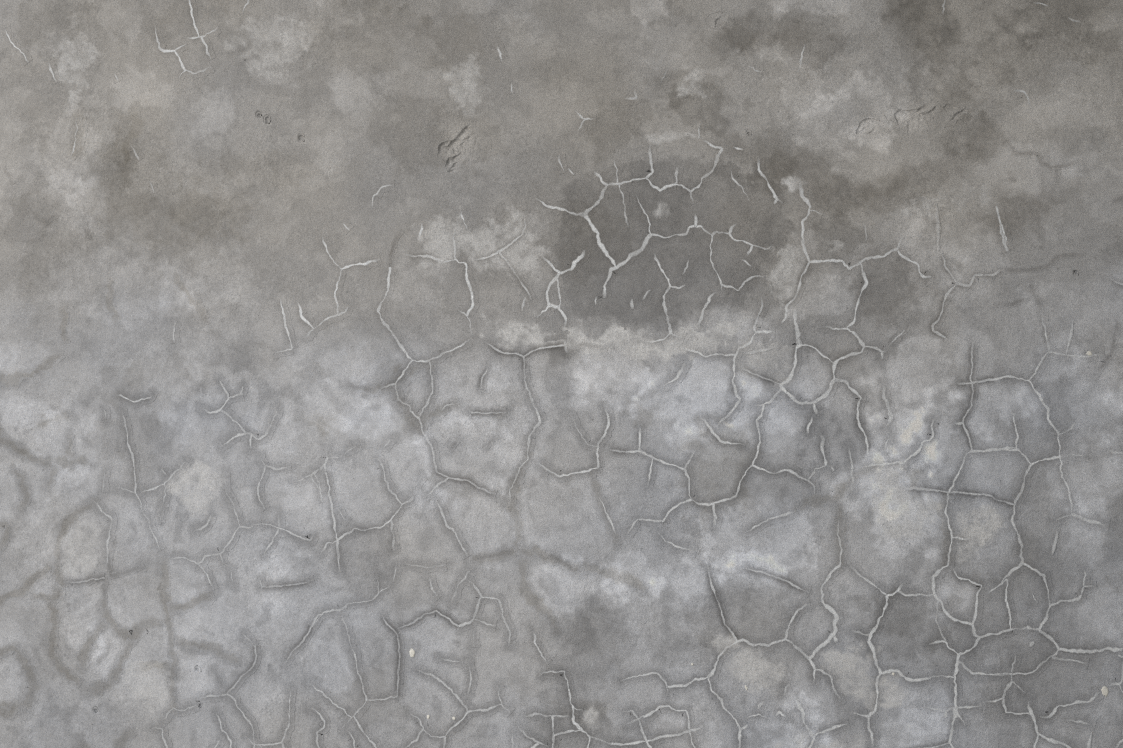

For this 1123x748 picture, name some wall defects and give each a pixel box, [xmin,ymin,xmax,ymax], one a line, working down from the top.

crack [150,0,221,81]
crack [63,125,1123,748]